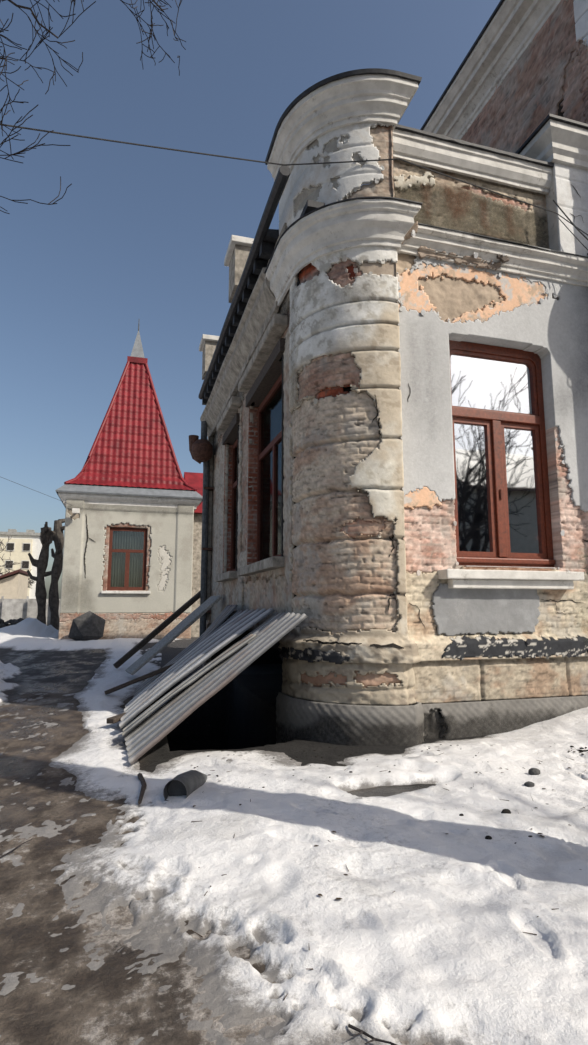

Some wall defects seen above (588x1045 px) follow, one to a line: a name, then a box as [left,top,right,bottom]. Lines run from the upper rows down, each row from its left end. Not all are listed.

flaking render [294,125,435,216]
flaking render [298,252,559,323]
crack [372,395,382,438]
flaking render [237,392,249,551]
flaking render [292,352,465,635]
flaking render [545,427,588,574]
peeling [278,647,402,688]
peeling [442,635,588,660]